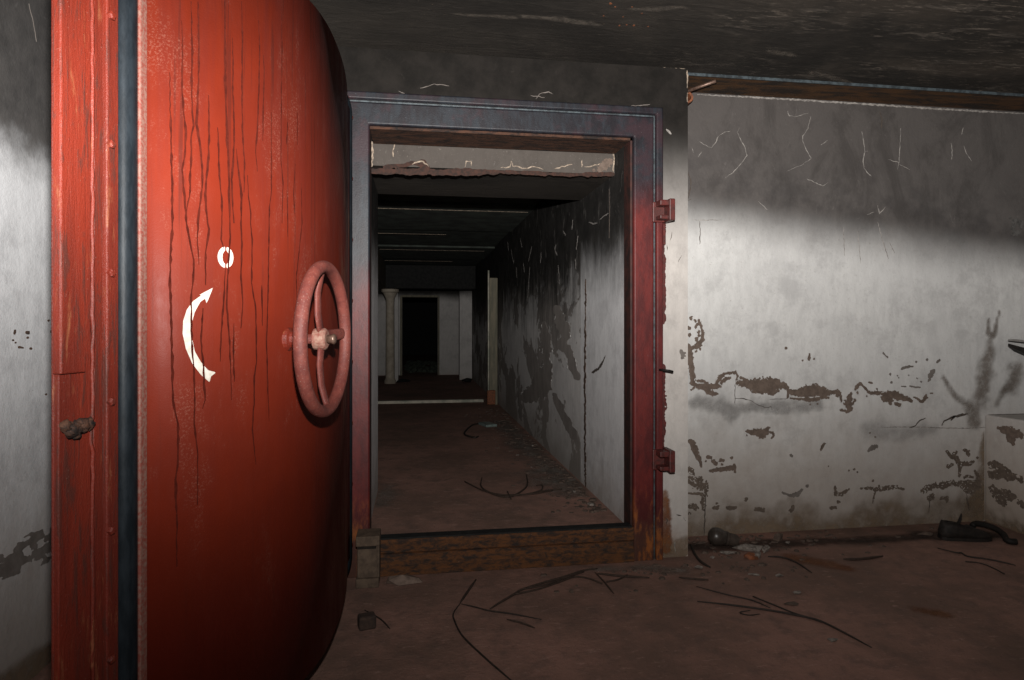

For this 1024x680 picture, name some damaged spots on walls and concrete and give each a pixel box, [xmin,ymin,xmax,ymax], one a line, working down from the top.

peeling [679,316,941,414]
damp [943,312,1024,538]
peeling [997,426,1024,446]
peeling [0,527,51,580]
corrosion [663,491,672,554]
flaking render [688,438,765,515]
damp [663,502,942,558]
peeling [829,479,905,510]
flaking render [920,448,1024,509]